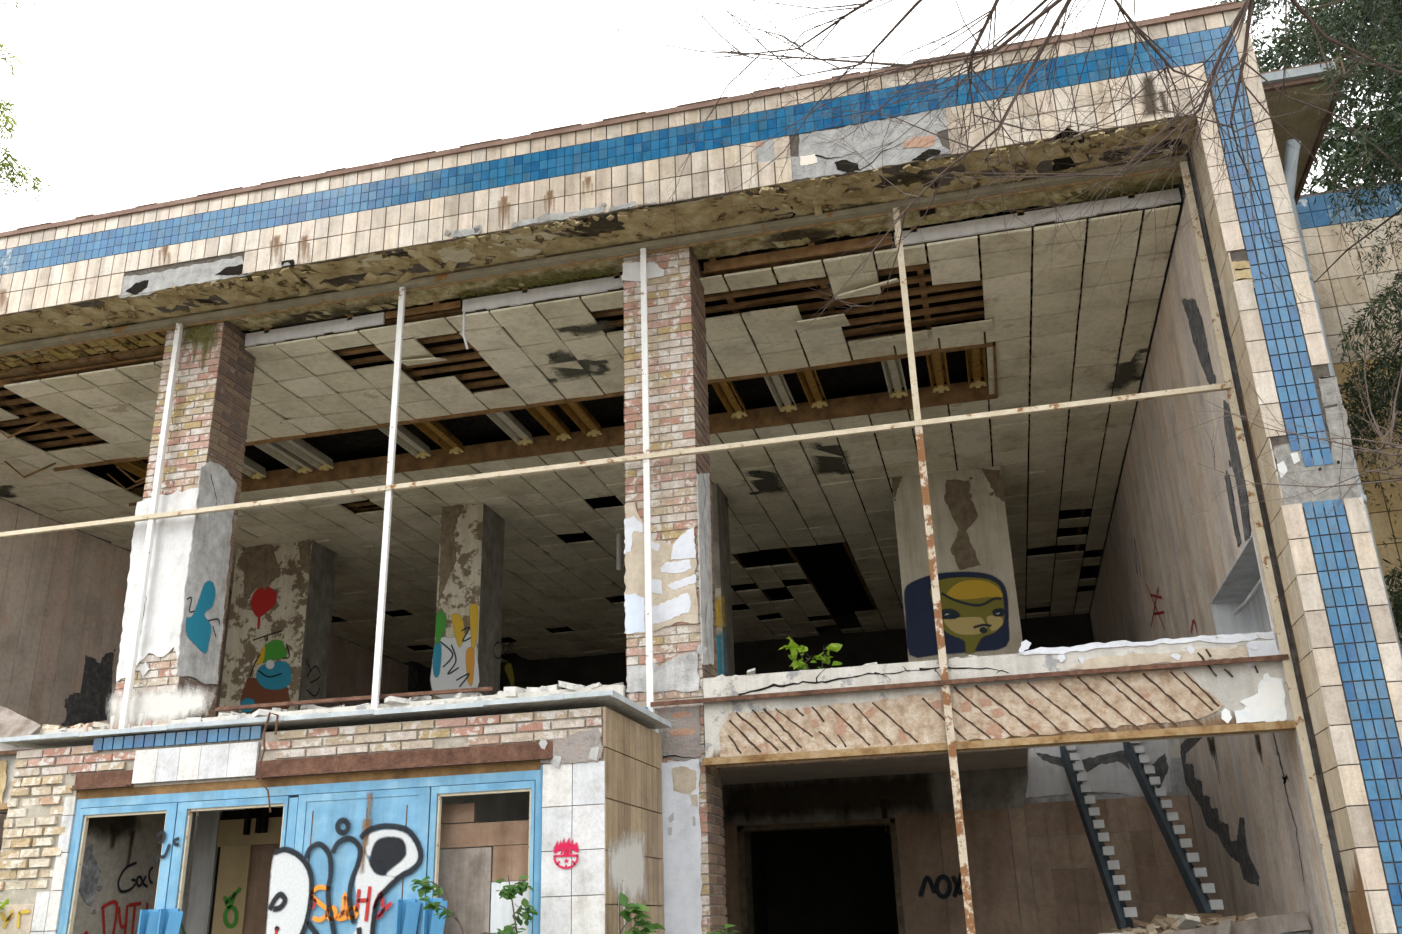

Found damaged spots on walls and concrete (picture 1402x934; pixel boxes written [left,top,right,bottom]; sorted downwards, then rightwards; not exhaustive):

spalling [729,107,977,219]
water stain [874,169,939,194]
spalling [65,256,398,334]
water stain [296,261,366,290]
water stain [566,213,625,238]
water stain [768,230,835,250]
peeling [63,461,315,729]
peeling [624,473,714,693]
rust [712,752,923,767]
spalling [719,631,1287,886]
rust [969,716,1264,741]
peeling [662,759,703,934]